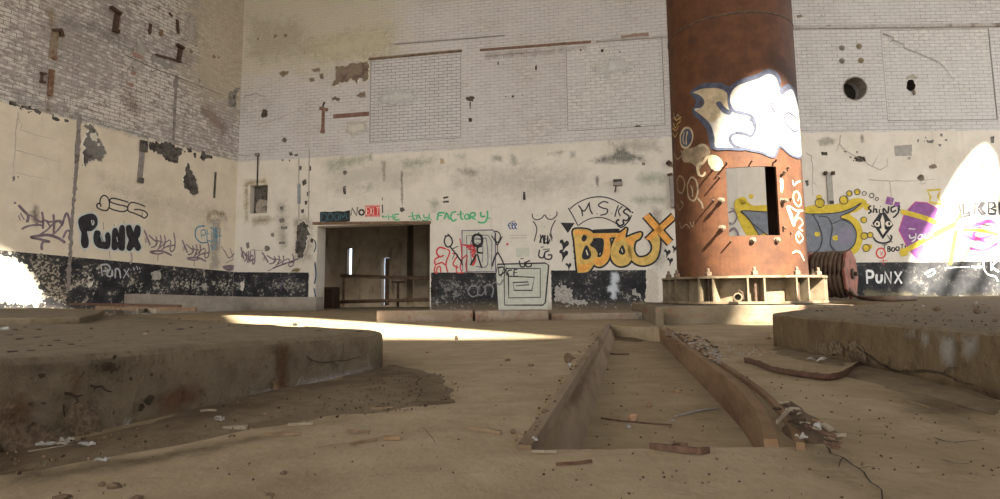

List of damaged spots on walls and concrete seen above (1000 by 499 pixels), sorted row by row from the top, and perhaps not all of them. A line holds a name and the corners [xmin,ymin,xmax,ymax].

crack [883,33,955,80]
spalling [309,61,371,102]
spalling [75,122,107,167]
spalling [149,141,213,196]
spalling [271,152,314,259]